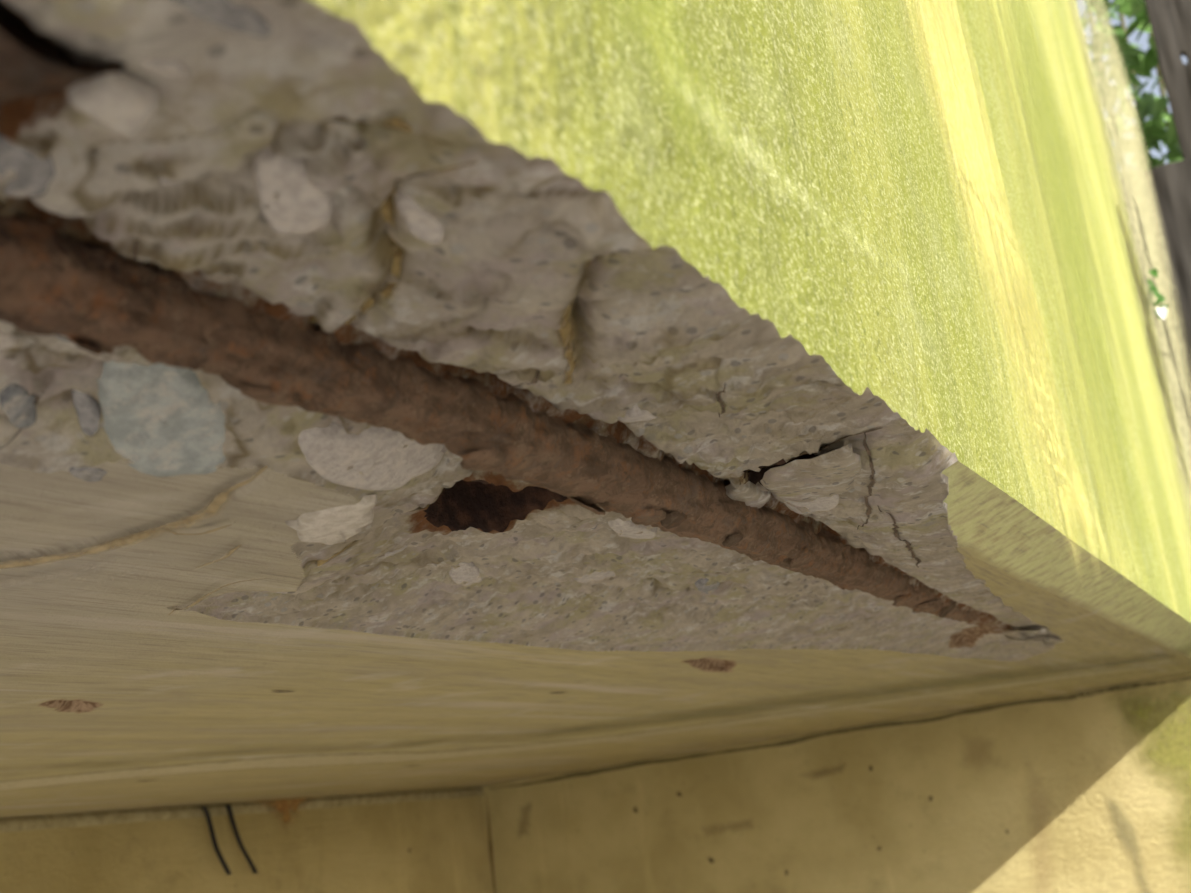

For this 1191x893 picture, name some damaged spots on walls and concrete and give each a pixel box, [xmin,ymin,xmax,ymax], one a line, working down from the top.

spalling [0,0,1064,672]
crack [0,466,268,615]
crack [857,433,921,568]